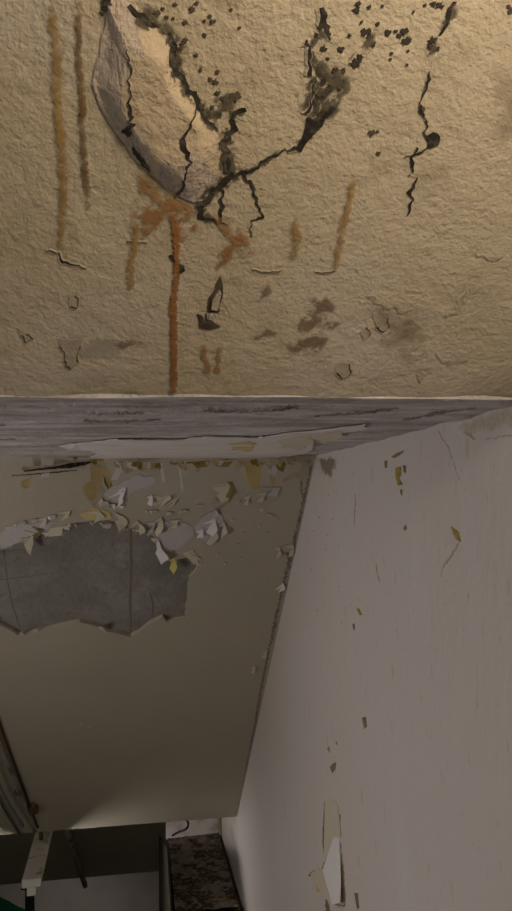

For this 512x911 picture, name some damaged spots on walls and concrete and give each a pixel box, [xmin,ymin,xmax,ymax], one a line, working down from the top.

rust [49,5,69,245]
rust [76,2,90,208]
crack [125,4,342,237]
damp [311,1,412,116]
crack [404,71,431,216]
damp [427,36,440,55]
crack [439,1,457,36]
rust [127,175,198,395]
spalling [198,276,223,330]
crack [204,404,512,480]
spalling [0,424,367,636]
peeling [308,799,359,911]